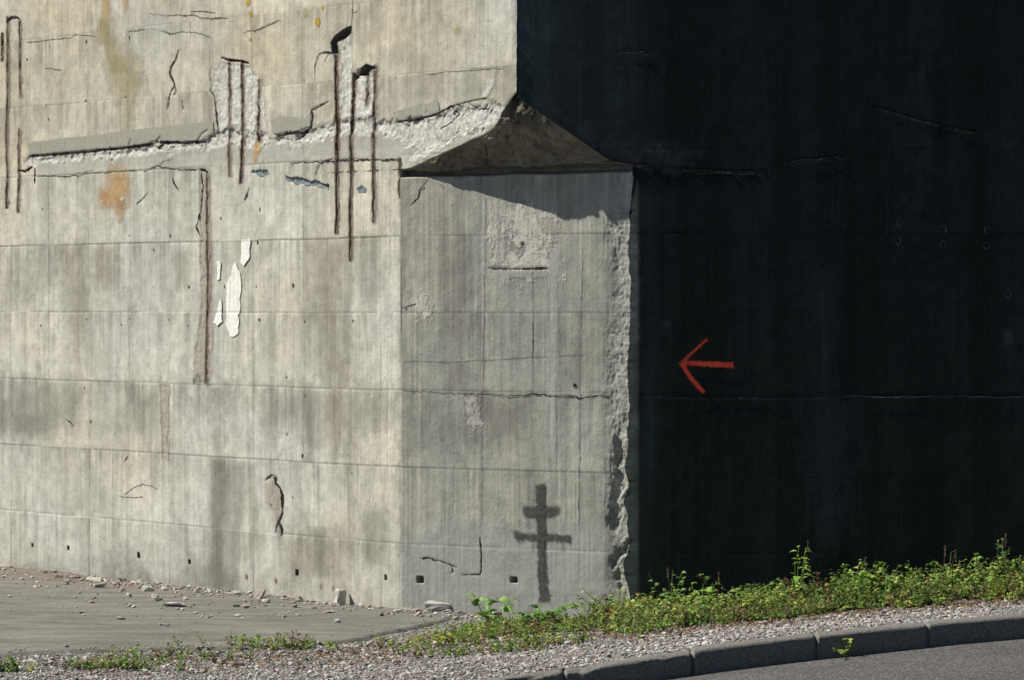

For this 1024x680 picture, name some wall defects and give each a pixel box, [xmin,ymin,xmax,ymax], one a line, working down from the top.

corrosion [102,170,127,220]
crack [30,70,218,234]
crack [128,10,281,107]
spalling [0,16,505,261]
spalling [188,169,259,386]
crack [404,197,614,528]
spalling [604,215,639,593]
crack [267,475,284,536]
crack [421,456,483,575]